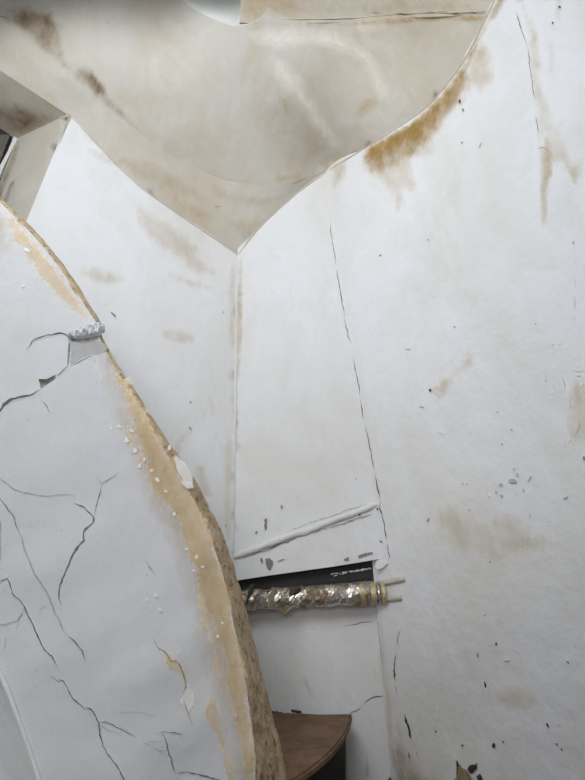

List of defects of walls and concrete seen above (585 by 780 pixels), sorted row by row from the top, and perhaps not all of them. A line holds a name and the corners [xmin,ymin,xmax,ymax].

damp [366,72,466,174]
crack [0,390,55,419]
crack [25,332,66,352]
spalling [39,375,56,389]
peeling [7,218,113,386]
crack [330,225,350,340]
damp [136,432,185,539]
crack [353,360,390,571]
crack [0,472,218,780]
peeling [109,365,257,780]
damp [197,565,235,697]
spalling [454,761,483,780]